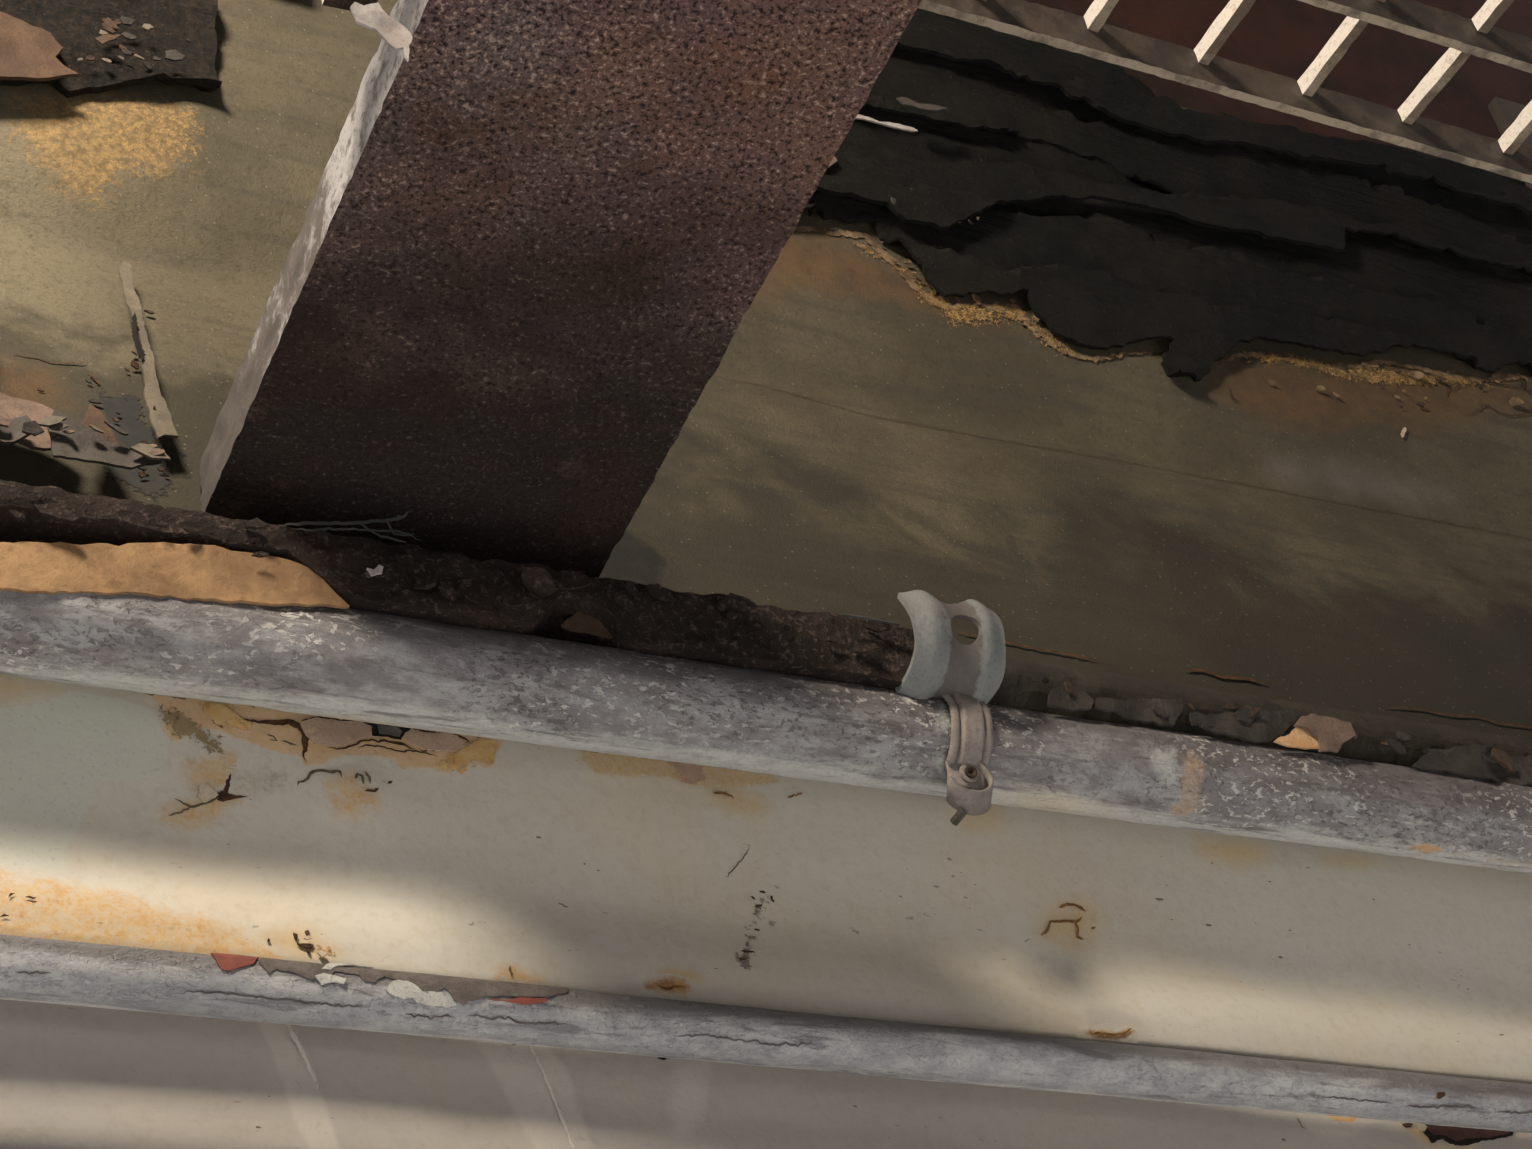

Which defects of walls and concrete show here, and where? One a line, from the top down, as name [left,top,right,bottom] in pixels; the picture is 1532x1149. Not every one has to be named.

peeling [0,11,79,81]
peeling [855,114,918,132]
peeling [896,97,947,112]
peeling [0,541,350,609]
spalling [135,692,521,782]
peeling [1041,677,1358,753]
peeling [1381,731,1532,787]
crack [297,763,395,833]
corrosion [0,869,359,965]
corrosion [1011,873,1126,970]
corrosion [628,958,715,1002]
spalling [1390,1121,1513,1149]